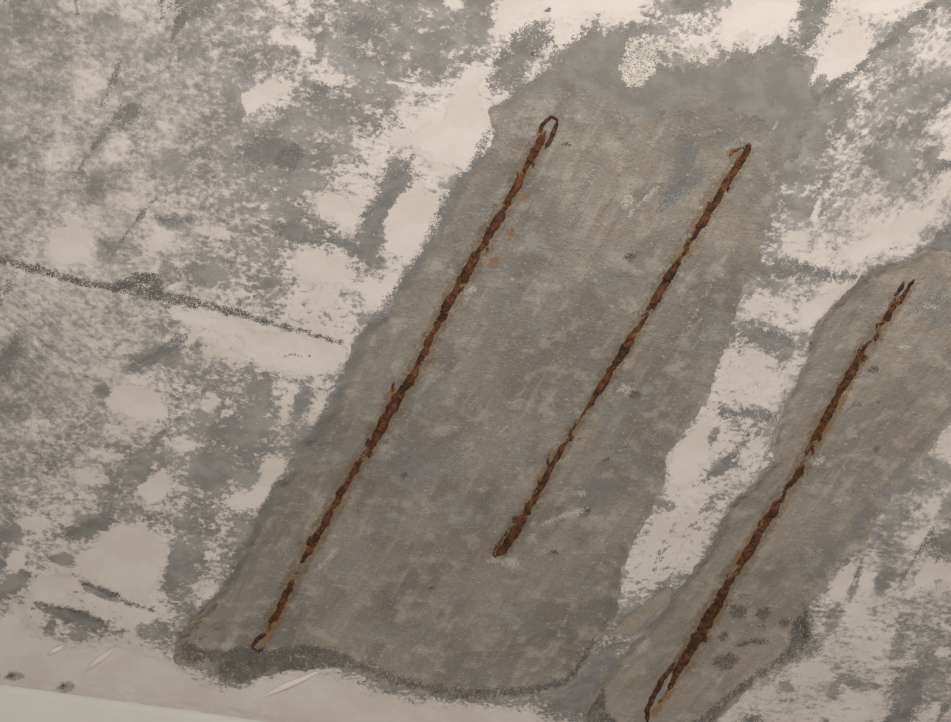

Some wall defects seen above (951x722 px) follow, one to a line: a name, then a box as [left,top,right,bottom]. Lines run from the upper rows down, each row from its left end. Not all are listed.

peeling [485,0,655,94]
peeling [793,0,837,57]
peeling [236,78,294,116]
peeling [271,218,387,270]
peeling [313,154,416,253]
crack [124,333,188,375]
crack [0,256,344,358]
peeling [160,304,348,380]
rust [257,129,550,648]
rust [489,142,752,561]
rust [650,285,915,718]
peeling [60,513,173,606]